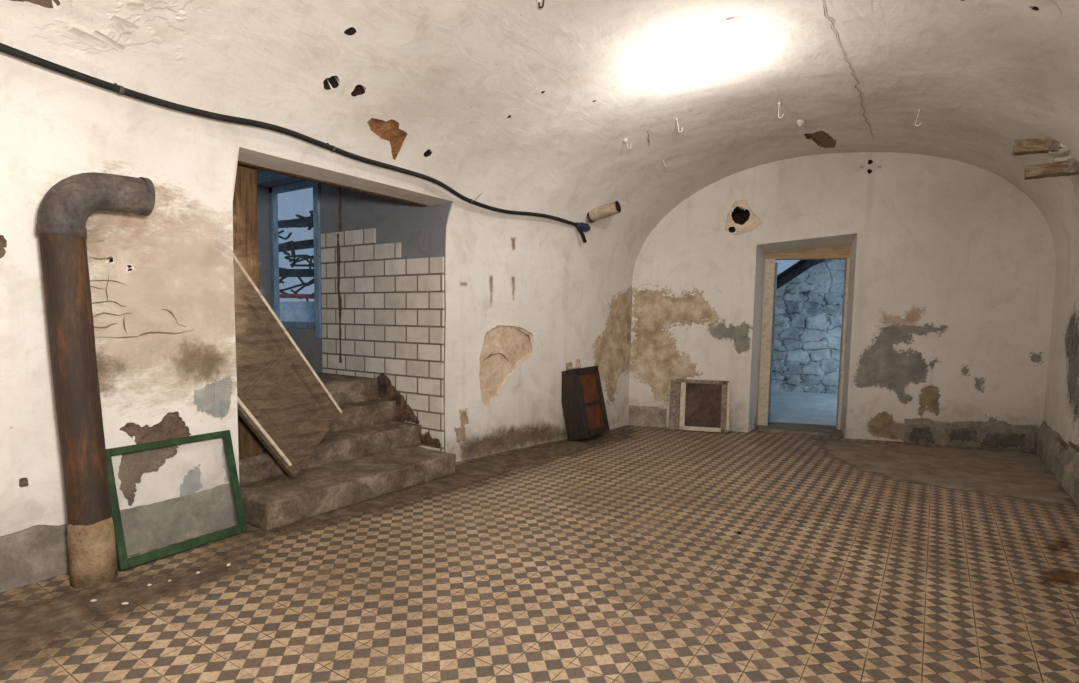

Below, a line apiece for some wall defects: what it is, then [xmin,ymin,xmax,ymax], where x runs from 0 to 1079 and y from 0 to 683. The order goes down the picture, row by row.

peeling [0,0,263,96]
flaking render [306,63,444,172]
crack [822,0,873,141]
flaking render [0,208,32,293]
spalling [720,197,762,241]
flaking render [0,458,51,536]
flaking render [103,377,233,510]
flaking render [454,316,540,443]
peeling [592,283,753,407]
peeling [852,309,948,444]
peeling [961,364,985,393]
peeling [949,414,1025,448]